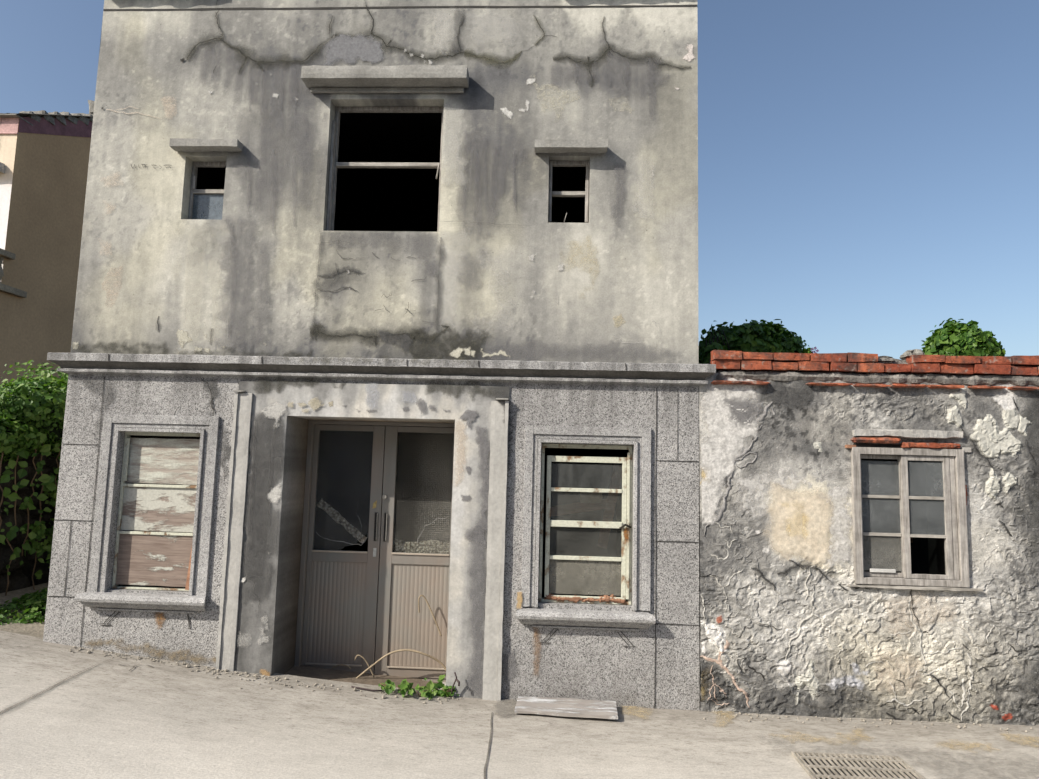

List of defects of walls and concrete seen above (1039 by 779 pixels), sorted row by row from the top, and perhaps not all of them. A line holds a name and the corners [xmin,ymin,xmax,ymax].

crack [186,0,691,80]
crack [310,221,449,346]
damp [243,412,284,600]
damp [465,426,490,692]
peeling [450,347,507,358]
damp [495,392,512,471]
peeling [701,379,758,524]
crack [700,387,1000,721]
peeling [993,392,1032,437]